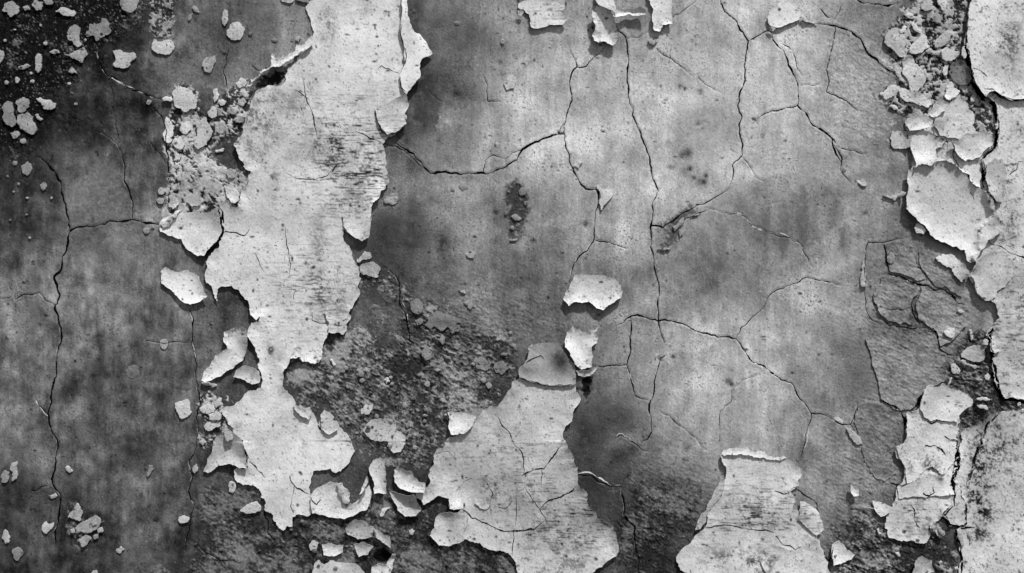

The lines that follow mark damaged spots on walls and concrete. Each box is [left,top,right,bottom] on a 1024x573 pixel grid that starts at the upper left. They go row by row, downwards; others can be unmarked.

crack [1,44,171,541]
spalling [0,0,175,199]
peeling [156,0,521,573]
crack [380,11,407,92]
crack [383,267,410,344]
crack [355,47,625,282]
peeling [389,0,1024,573]
crack [456,0,1024,573]